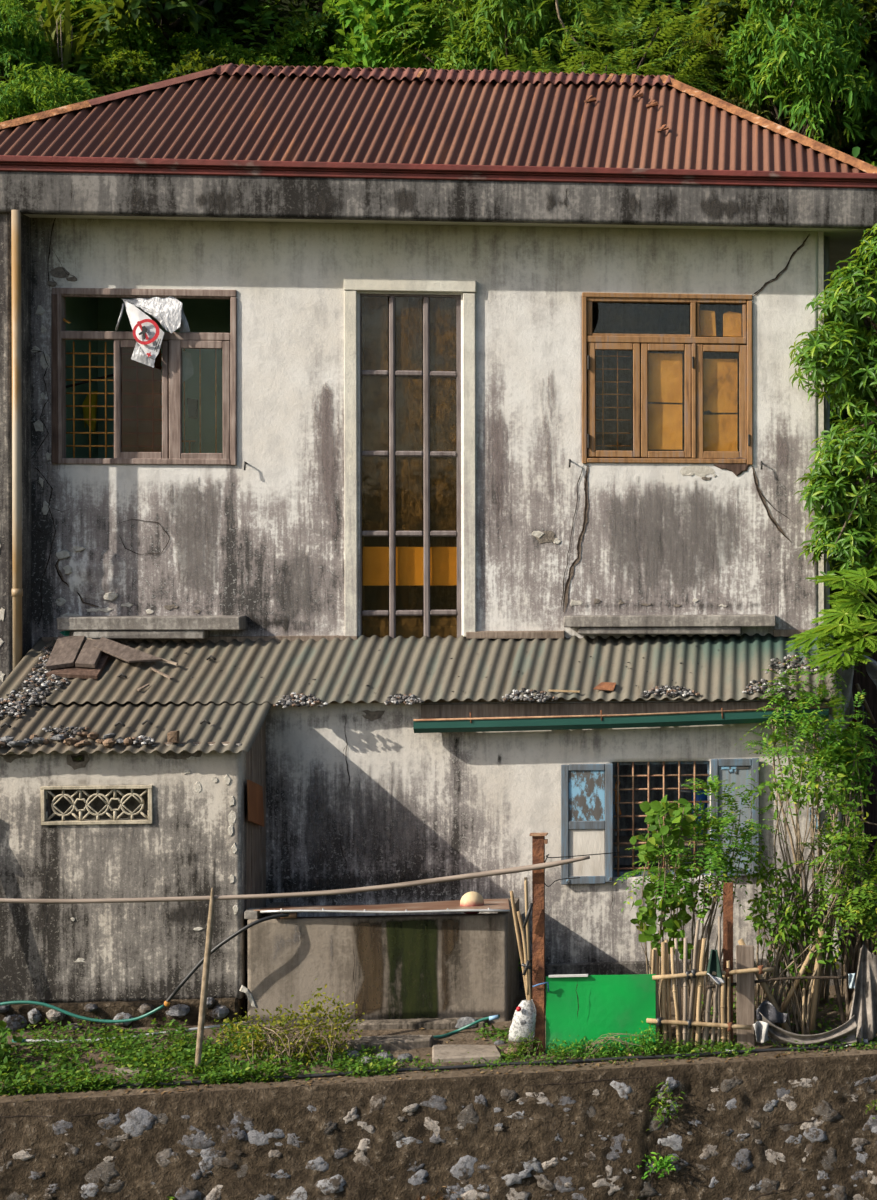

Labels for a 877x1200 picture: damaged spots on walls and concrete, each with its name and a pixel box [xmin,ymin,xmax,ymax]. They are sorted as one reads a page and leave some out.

damp [395,188,413,214]
damp [700,200,753,220]
crack [753,235,810,296]
damp [317,383,337,534]
damp [490,412,507,520]
damp [170,486,217,589]
crack [560,465,589,614]
damp [611,487,736,588]
crack [752,467,791,542]
damp [246,557,310,630]
damp [171,860,215,925]
damp [271,869,460,893]